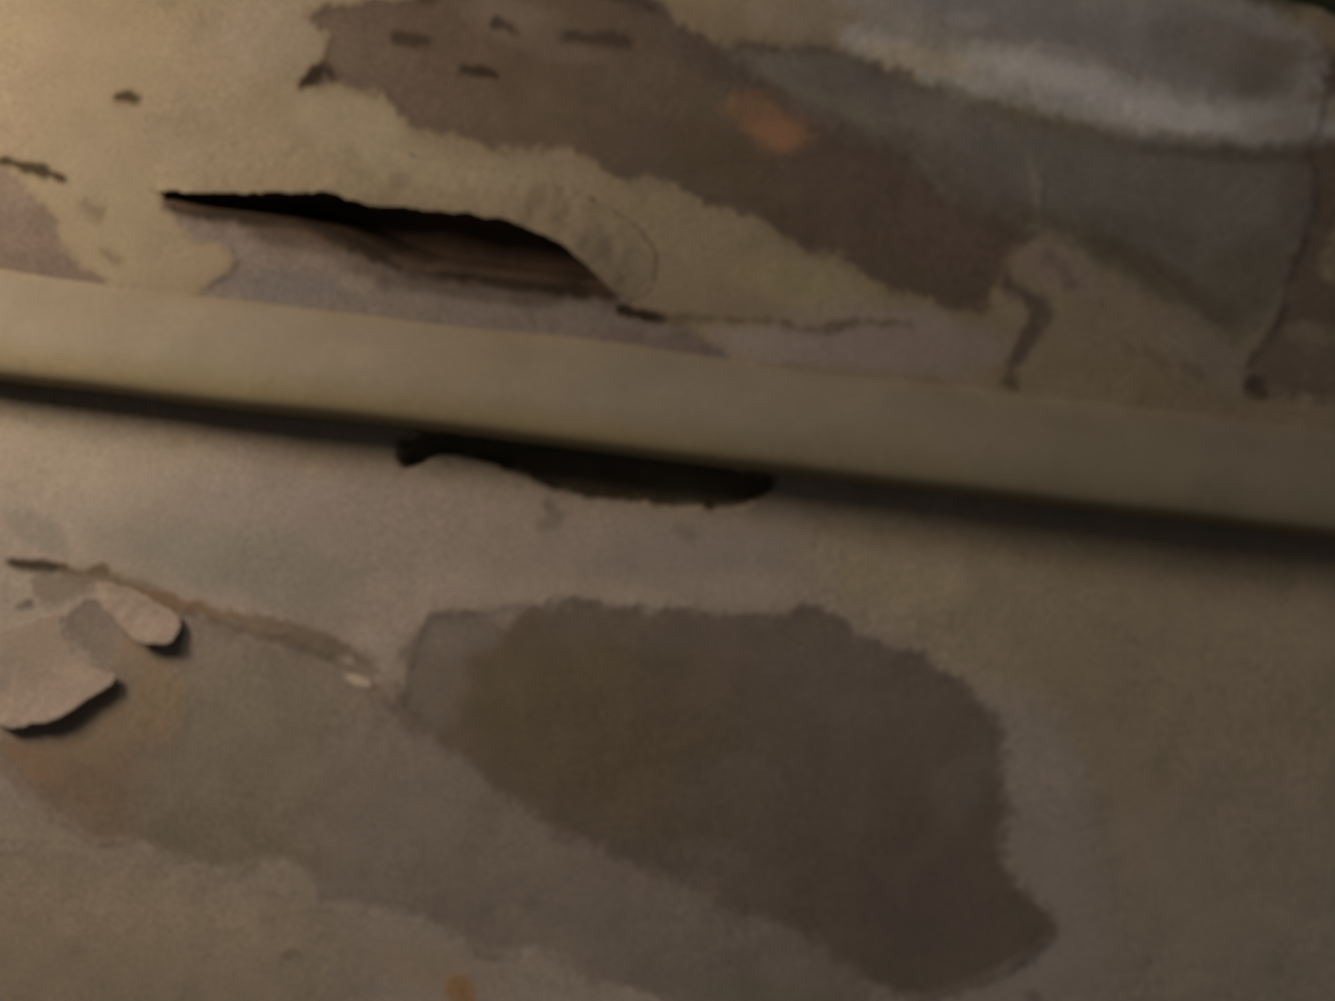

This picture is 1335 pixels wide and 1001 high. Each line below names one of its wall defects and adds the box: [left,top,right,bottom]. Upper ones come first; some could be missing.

peeling [0,168,127,286]
spalling [147,0,1036,363]
water stain [716,0,1335,353]
spalling [1236,147,1335,410]
peeling [0,394,1173,1001]
water stain [390,584,1065,1001]